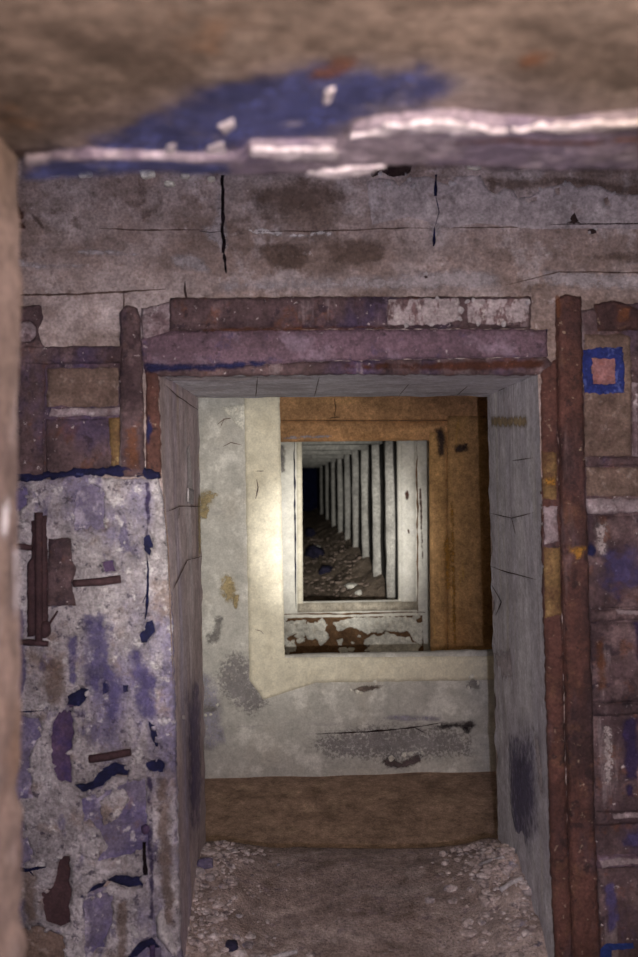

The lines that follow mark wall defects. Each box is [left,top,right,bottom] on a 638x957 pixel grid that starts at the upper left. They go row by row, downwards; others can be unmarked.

spalling [23,108,638,234]
crack [99,175,227,273]
damp [255,182,345,209]
crack [253,225,409,233]
crack [433,175,519,246]
crack [551,220,638,228]
rust [402,360,544,370]
peeling [284,613,424,655]